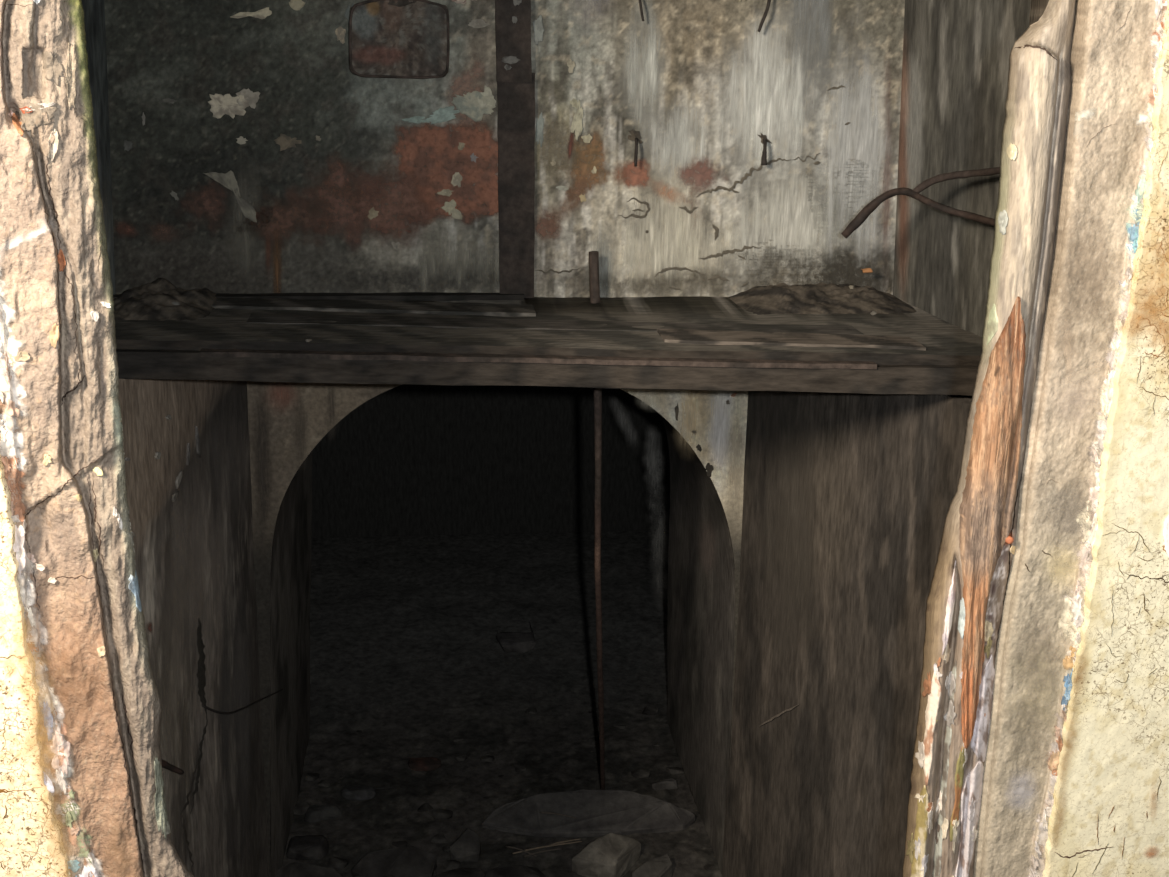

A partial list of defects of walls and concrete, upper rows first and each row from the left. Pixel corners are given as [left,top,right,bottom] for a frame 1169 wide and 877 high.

crack [1,0,33,95]
spalling [9,42,77,161]
damp [630,23,657,120]
crack [30,141,85,407]
peeling [170,62,498,250]
corrosion [615,160,649,186]
crack [618,197,650,233]
damp [597,198,726,295]
crack [655,153,821,290]
peeling [0,268,105,877]
peeling [922,643,963,727]
peeling [906,790,978,877]